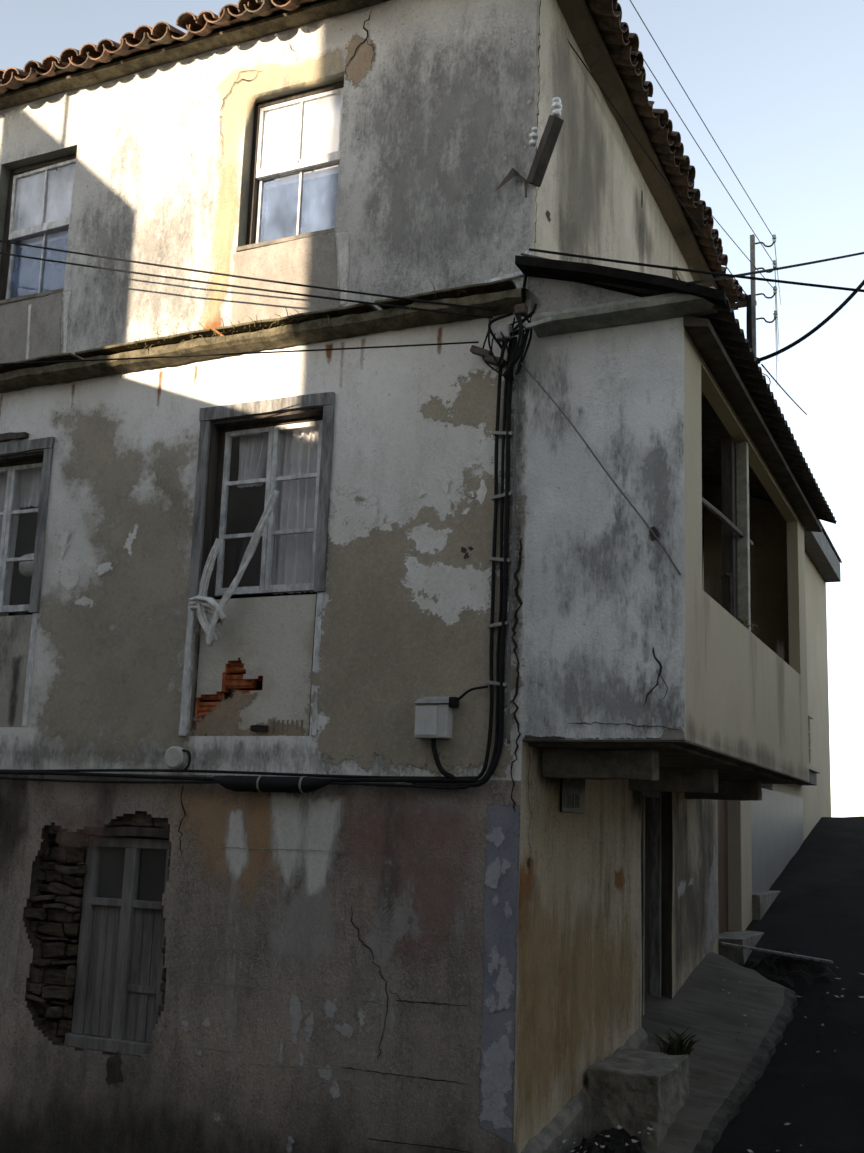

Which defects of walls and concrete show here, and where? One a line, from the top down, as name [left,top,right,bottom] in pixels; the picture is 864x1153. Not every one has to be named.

peeling [345,35,376,87]
damp [558,47,605,262]
damp [636,194,650,252]
peeling [418,367,523,440]
peeling [37,410,527,778]
crack [568,647,678,730]
flaking render [24,811,171,1044]
peeling [226,809,248,880]
peeling [268,790,345,977]
crack [350,905,404,1060]
peeling [479,804,520,1144]
spalling [106,1051,123,1087]